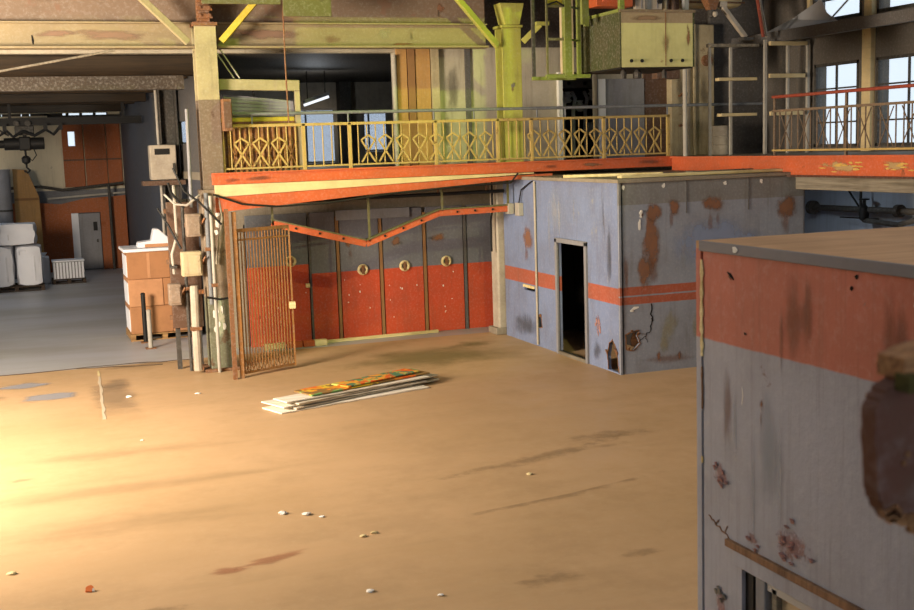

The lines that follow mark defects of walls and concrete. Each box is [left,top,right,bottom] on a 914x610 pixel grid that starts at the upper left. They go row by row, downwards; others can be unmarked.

corrosion [778,196,795,217]
corrosion [638,200,679,285]
crack [638,303,653,343]